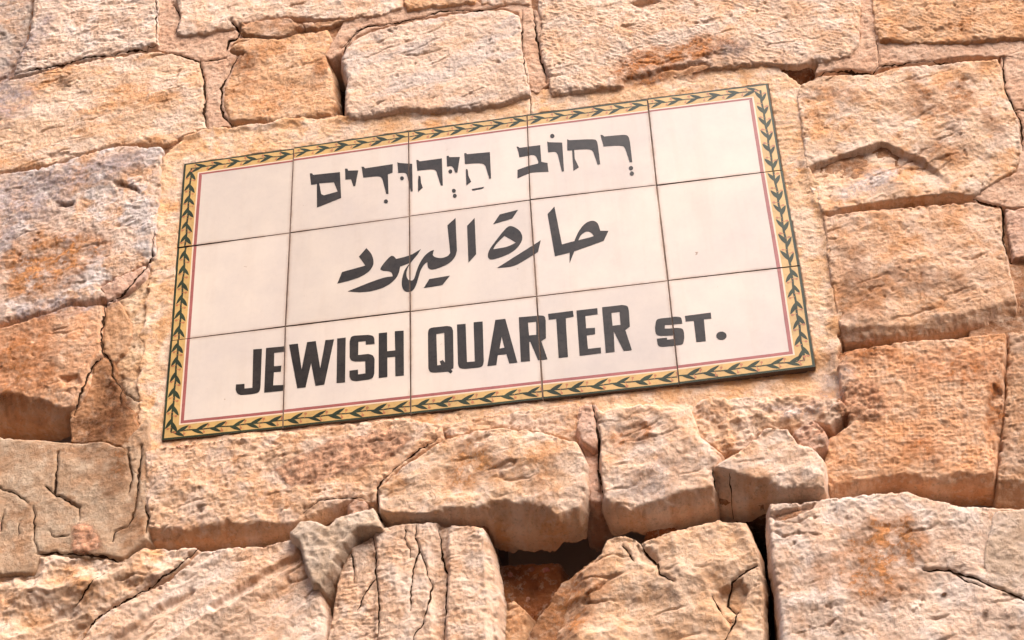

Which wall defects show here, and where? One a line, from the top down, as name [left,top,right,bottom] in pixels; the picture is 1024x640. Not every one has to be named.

crack [0,446,199,640]
crack [304,437,448,640]
crack [712,566,758,640]
crack [924,569,1024,601]